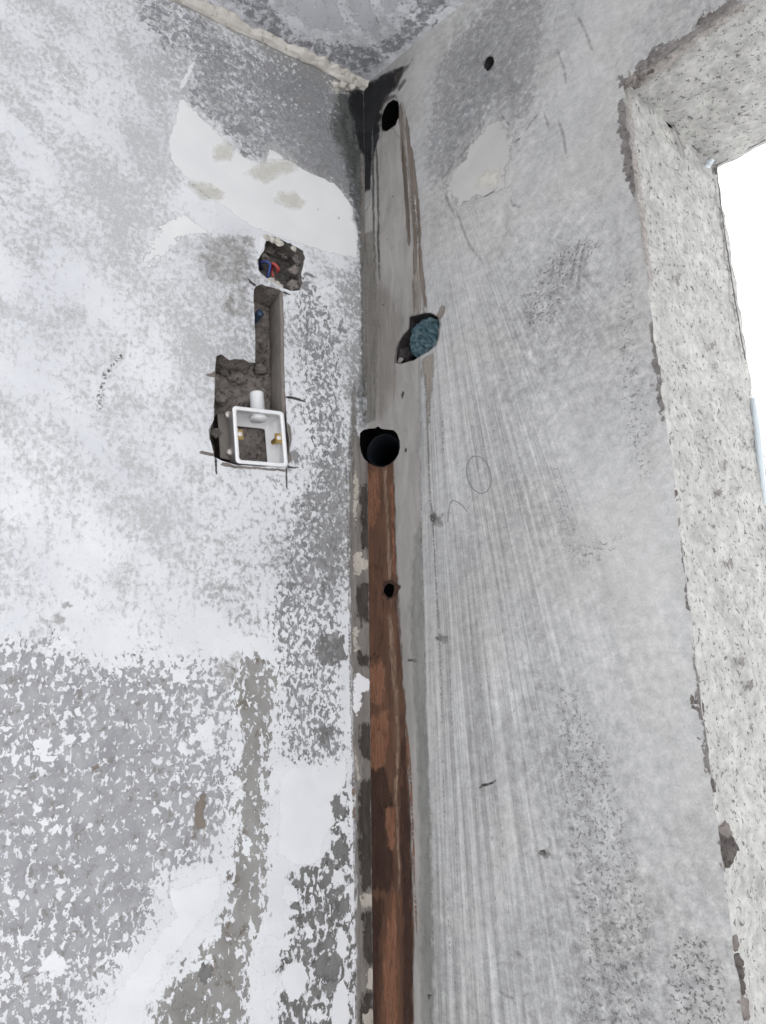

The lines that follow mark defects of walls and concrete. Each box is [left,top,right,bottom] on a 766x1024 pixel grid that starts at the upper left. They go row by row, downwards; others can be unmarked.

flaking render [139,0,360,203]
flaking render [0,234,373,1024]
rust [368,462,417,1024]